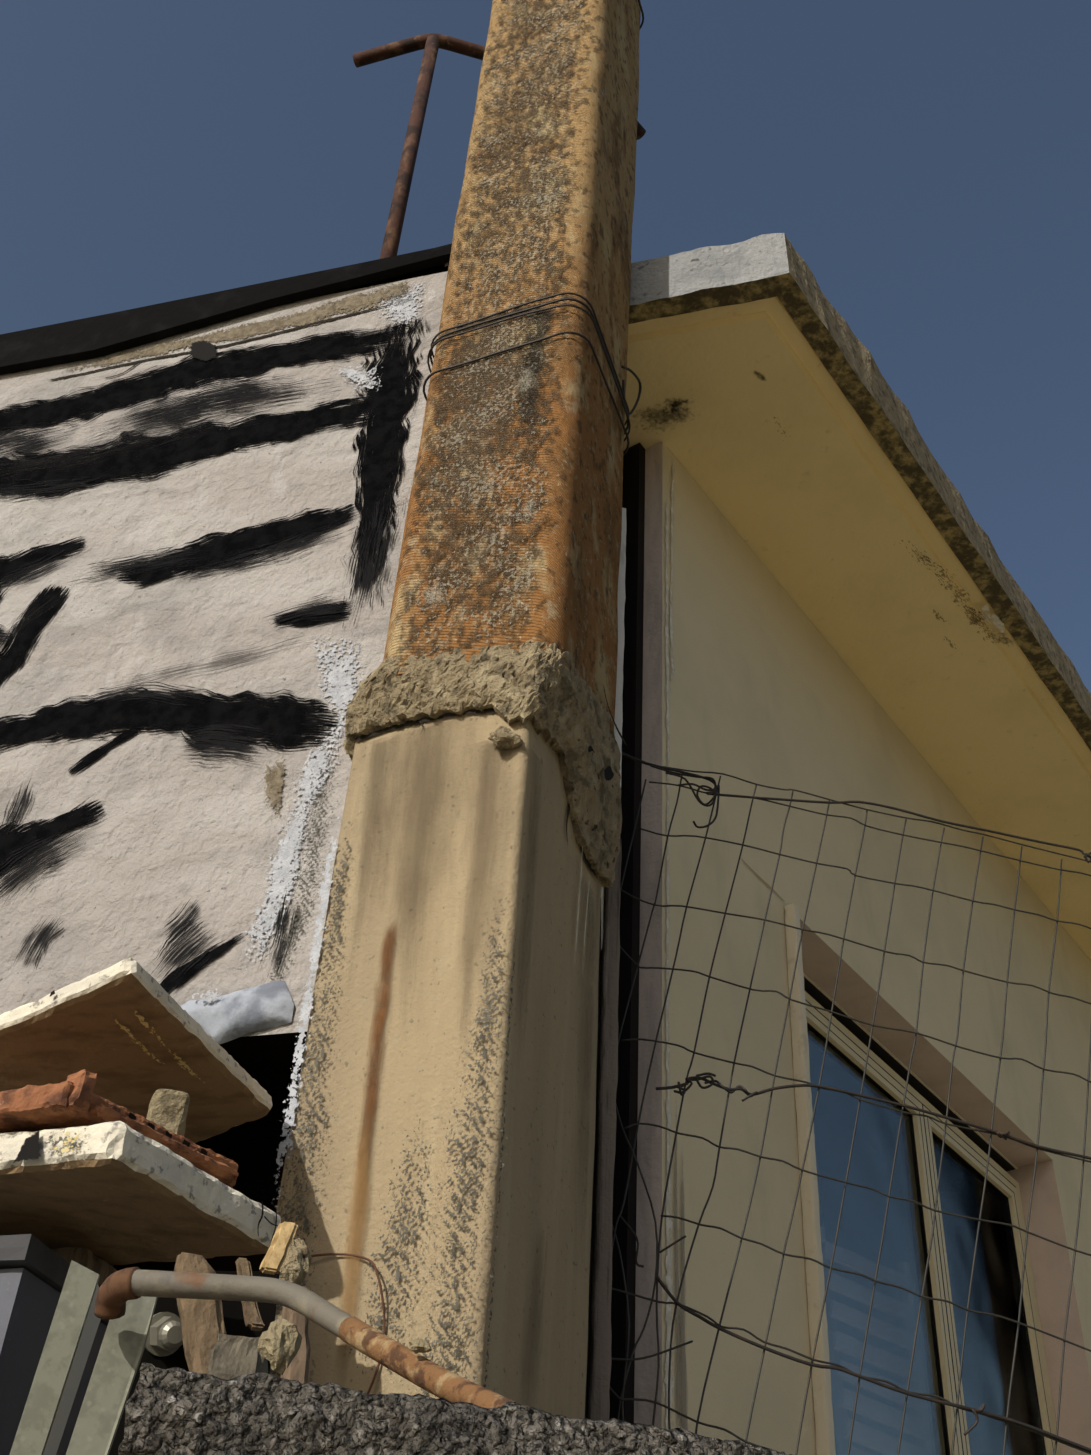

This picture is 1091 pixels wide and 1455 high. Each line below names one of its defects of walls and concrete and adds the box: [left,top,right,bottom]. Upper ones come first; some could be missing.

rust [359,929,394,1190]